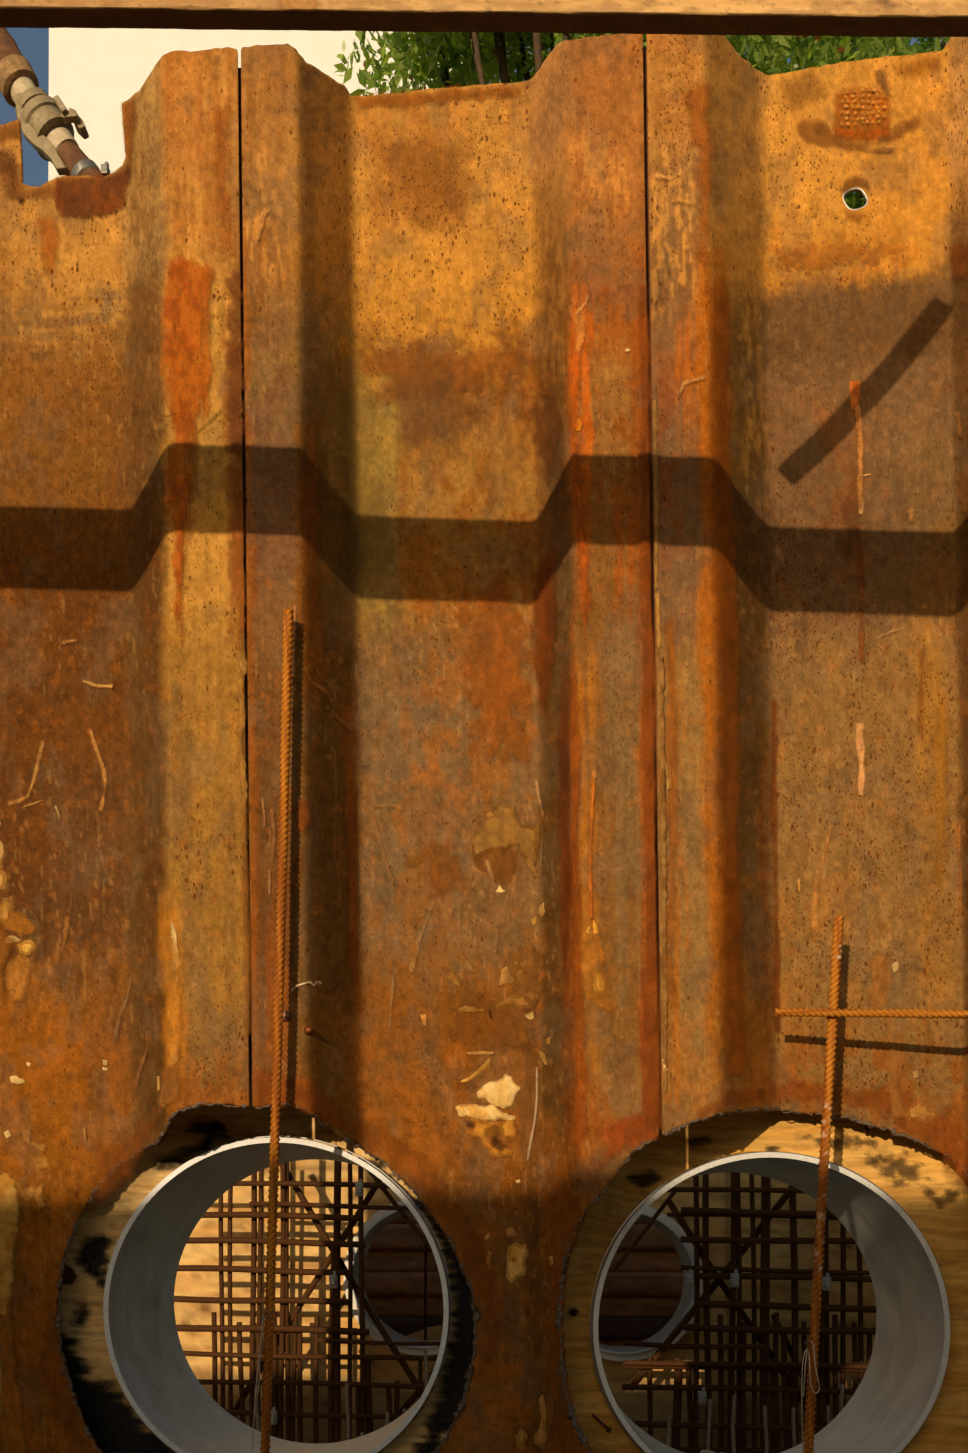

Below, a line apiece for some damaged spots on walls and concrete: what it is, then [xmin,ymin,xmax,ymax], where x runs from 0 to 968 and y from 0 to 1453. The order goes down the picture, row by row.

rust [0,101,135,268]
rust [843,176,868,191]
rust [834,87,890,139]
rust [160,255,244,634]
rust [569,311,590,617]
peeling [0,822,36,999]
rust [297,799,310,829]
peeling [470,804,540,893]
rust [570,683,611,1138]
rust [638,284,677,1129]
rust [699,279,968,1187]
peeling [447,944,550,1158]